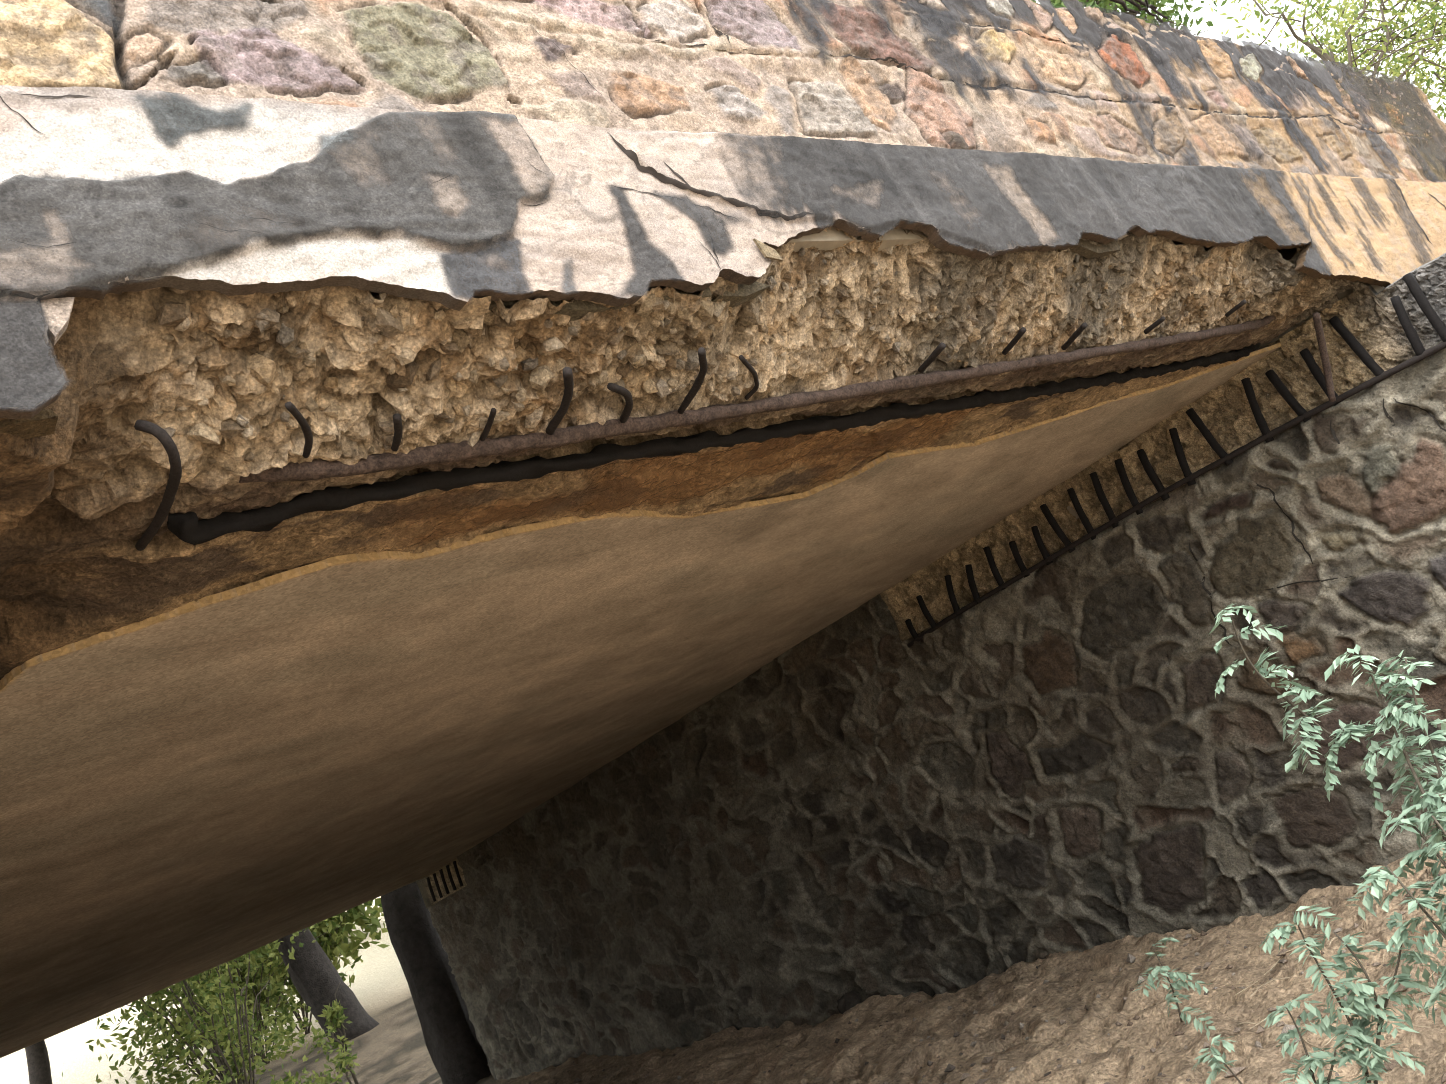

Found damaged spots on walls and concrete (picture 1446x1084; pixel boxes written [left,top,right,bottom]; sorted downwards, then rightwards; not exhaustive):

crack [0,94,90,134]
crack [610,134,811,269]
crack [0,289,48,299]
spalling [0,226,1446,680]